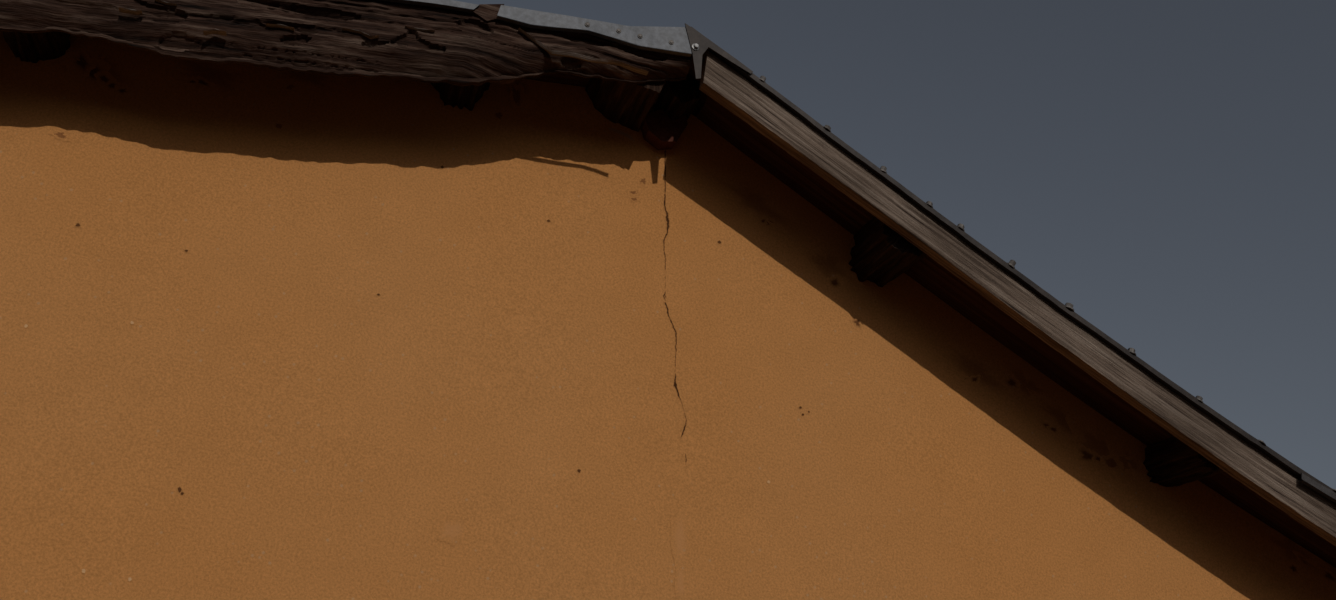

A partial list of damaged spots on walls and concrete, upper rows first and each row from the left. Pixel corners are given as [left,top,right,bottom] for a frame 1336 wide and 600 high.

crack [663,150,687,465]